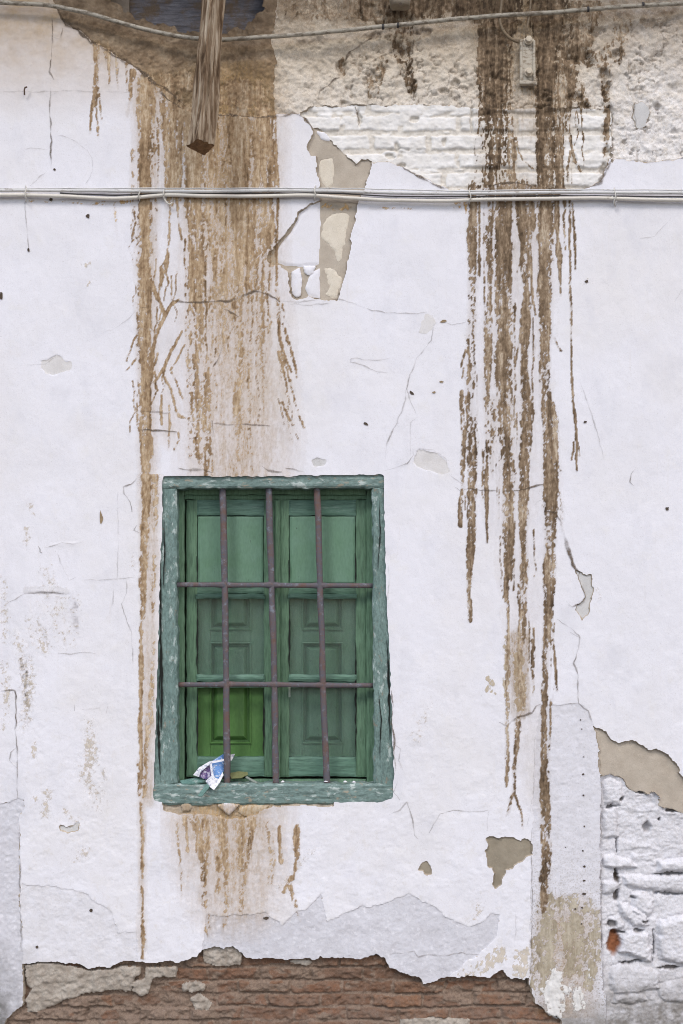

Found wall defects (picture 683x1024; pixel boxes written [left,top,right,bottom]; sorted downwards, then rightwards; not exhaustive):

spalling [53,0,199,107]
spalling [220,0,683,301]
peeling [41,355,72,375]
water stain [89,40,305,959]
peeling [414,450,450,474]
water stain [458,0,601,996]
peeling [575,570,594,620]
spalling [0,722,683,1024]